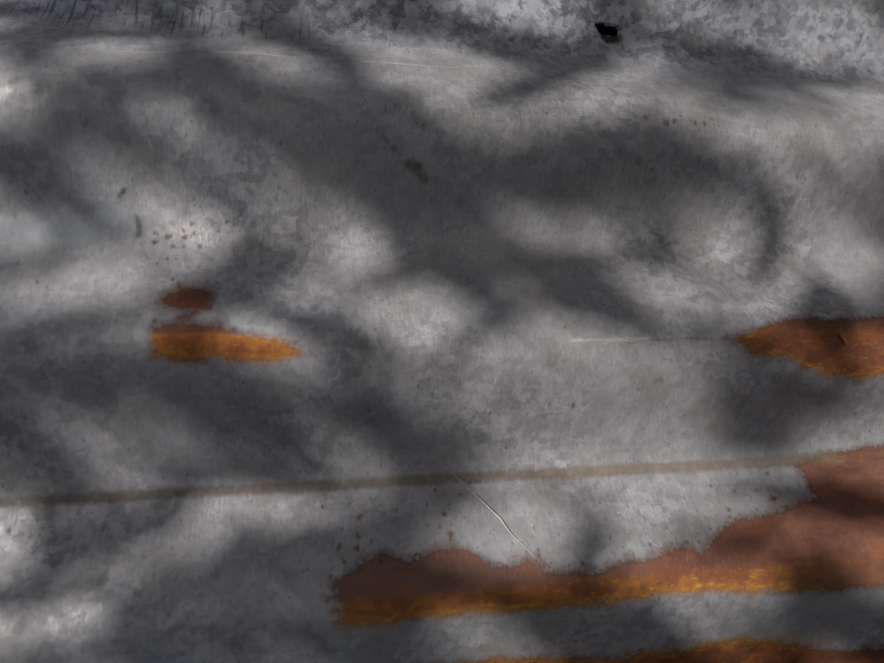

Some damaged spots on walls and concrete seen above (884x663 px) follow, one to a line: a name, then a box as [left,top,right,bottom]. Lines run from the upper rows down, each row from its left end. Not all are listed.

rust [150,285,299,364]
rust [734,316,884,379]
rust [331,446,884,627]
rust [458,639,884,663]